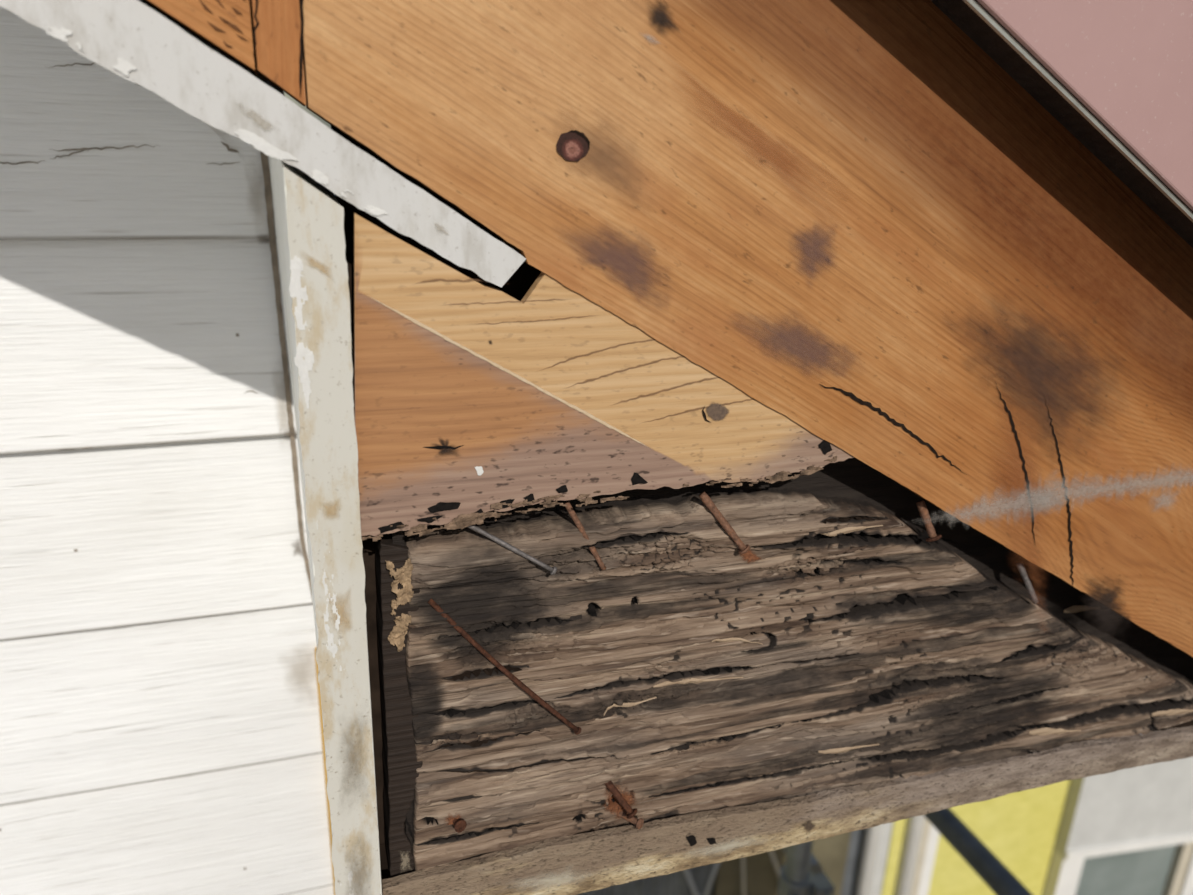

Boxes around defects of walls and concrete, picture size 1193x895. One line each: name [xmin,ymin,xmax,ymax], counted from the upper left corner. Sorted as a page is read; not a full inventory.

peeling [46,27,85,52]
crack [45,61,95,69]
crack [0,144,155,165]
peeling [234,128,298,161]
peeling [311,169,329,185]
peeling [364,205,388,216]
peeling [289,256,314,409]
crack [820,384,967,475]
crack [995,382,1036,546]
spalling [631,473,648,485]
crack [1045,399,1074,588]
spalling [378,522,404,533]